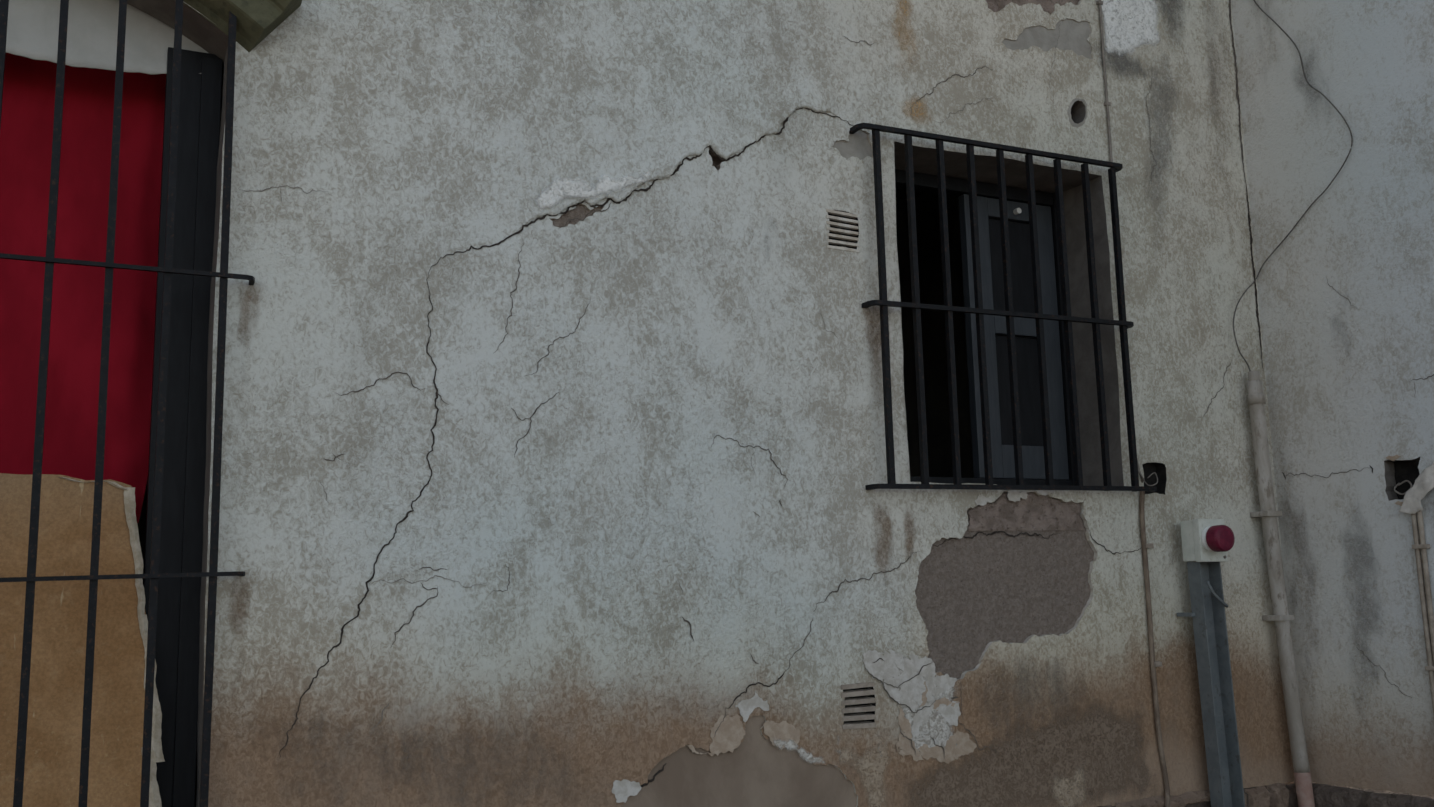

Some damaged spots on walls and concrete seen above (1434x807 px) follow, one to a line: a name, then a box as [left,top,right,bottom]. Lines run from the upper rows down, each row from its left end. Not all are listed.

peeling [986,0,1159,59]
crack [279,108,854,759]
crack [1282,466,1373,479]
crack [713,551,920,738]
spalling [611,490,1097,807]